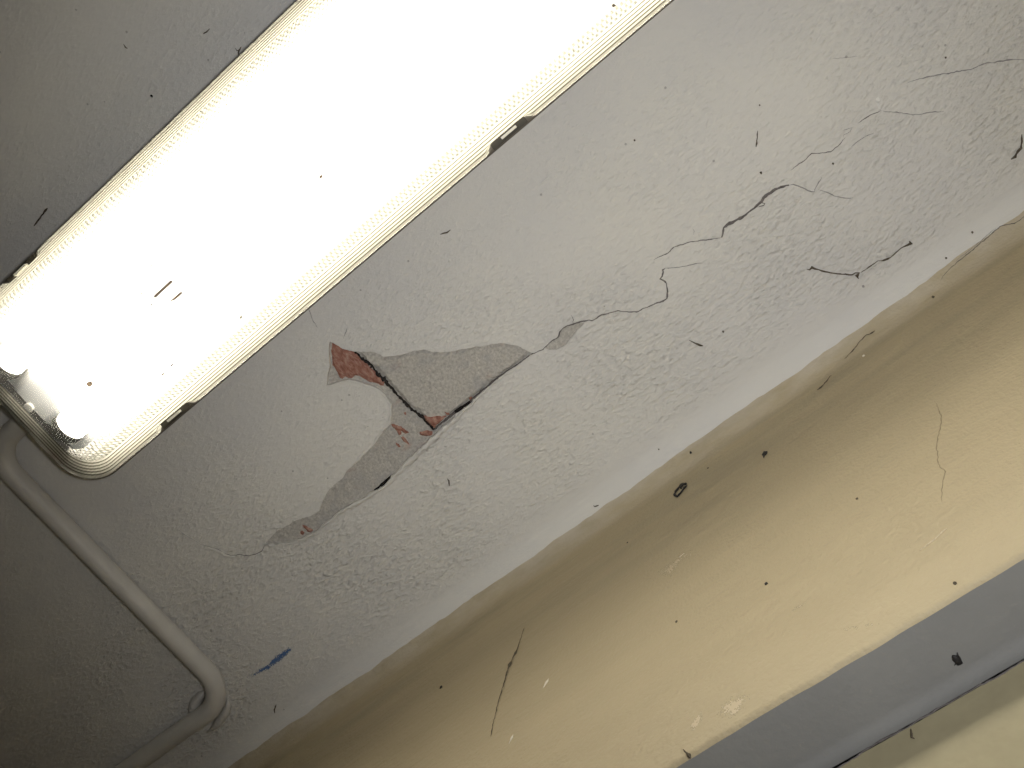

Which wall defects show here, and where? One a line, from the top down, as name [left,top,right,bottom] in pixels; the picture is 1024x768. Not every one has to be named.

crack [908,59,1023,83]
crack [532,97,942,354]
flaking render [266,342,534,547]